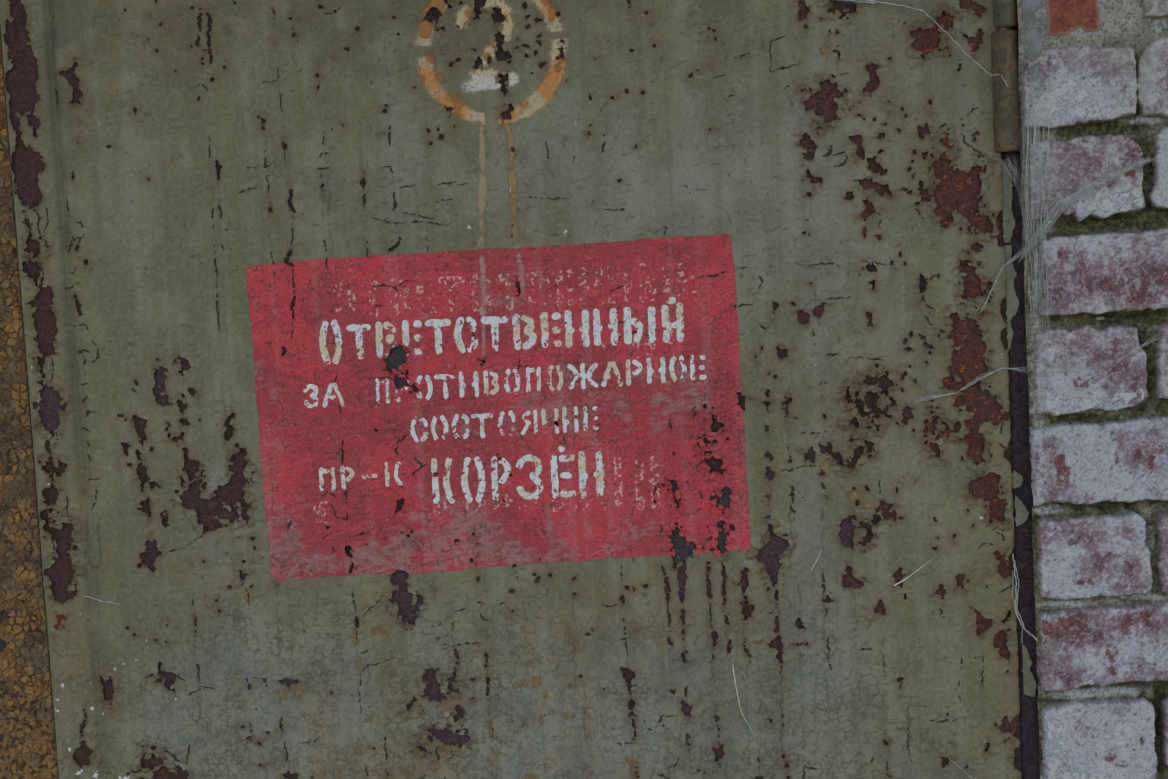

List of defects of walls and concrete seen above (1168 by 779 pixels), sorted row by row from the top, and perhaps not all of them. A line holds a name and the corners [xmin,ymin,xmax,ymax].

peeling [798,0,856,34]
peeling [898,0,987,72]
peeling [2,0,86,631]
peeling [760,301,828,346]
peeling [796,57,1011,528]
peeling [117,355,255,573]
peeling [388,570,424,626]
peeling [652,403,735,568]
peeling [750,515,791,591]
peeling [836,480,903,588]
peeling [407,621,476,761]
peeling [136,745,189,779]